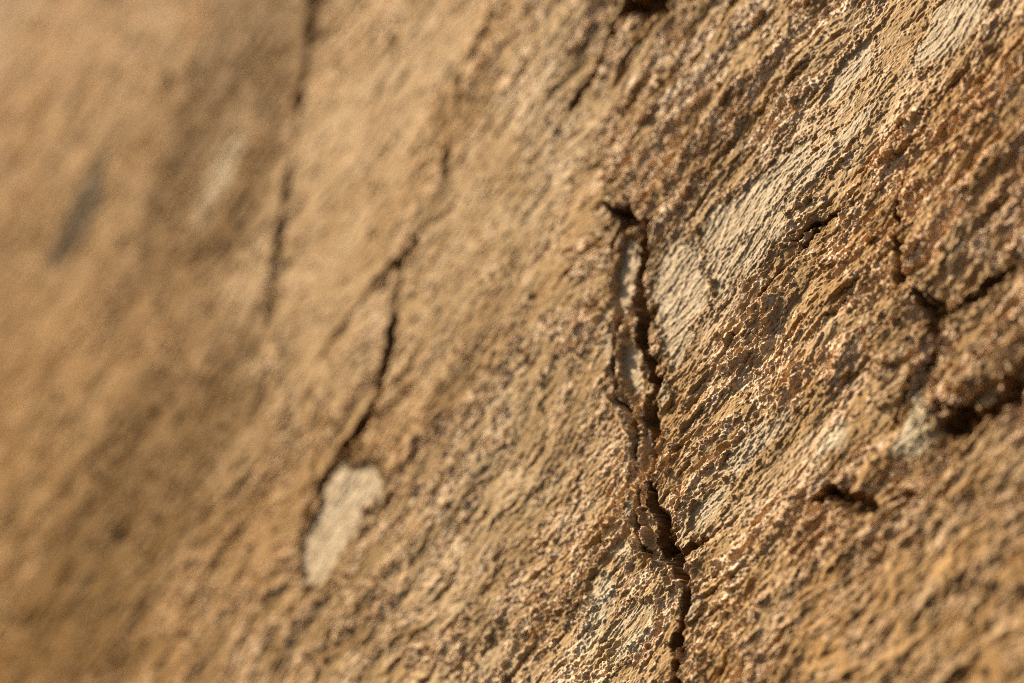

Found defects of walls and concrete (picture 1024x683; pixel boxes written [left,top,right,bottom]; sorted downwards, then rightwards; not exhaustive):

crack [455,0,496,104]
spalling [299,446,397,597]
crack [300,132,452,535]
crack [594,201,725,683]
crack [890,159,1024,440]